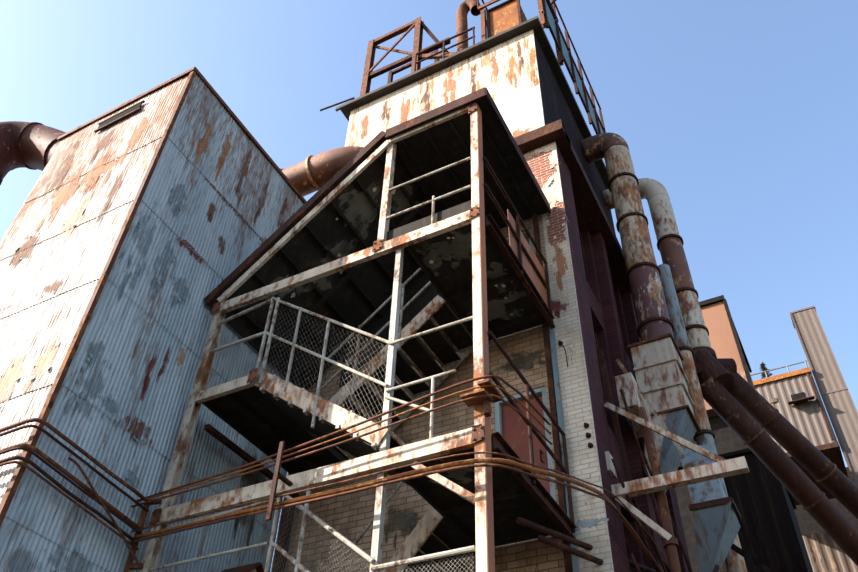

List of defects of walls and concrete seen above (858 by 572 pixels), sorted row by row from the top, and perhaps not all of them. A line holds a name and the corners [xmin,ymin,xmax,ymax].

corrosion [35,129,114,232]
corrosion [98,117,148,220]
corrosion [195,124,212,164]
corrosion [205,132,268,244]
peeling [526,150,558,188]
peeling [546,201,570,246]
corrosion [177,239,208,264]
corrosion [35,280,63,300]
peeling [0,341,60,404]
corrosion [140,348,185,400]